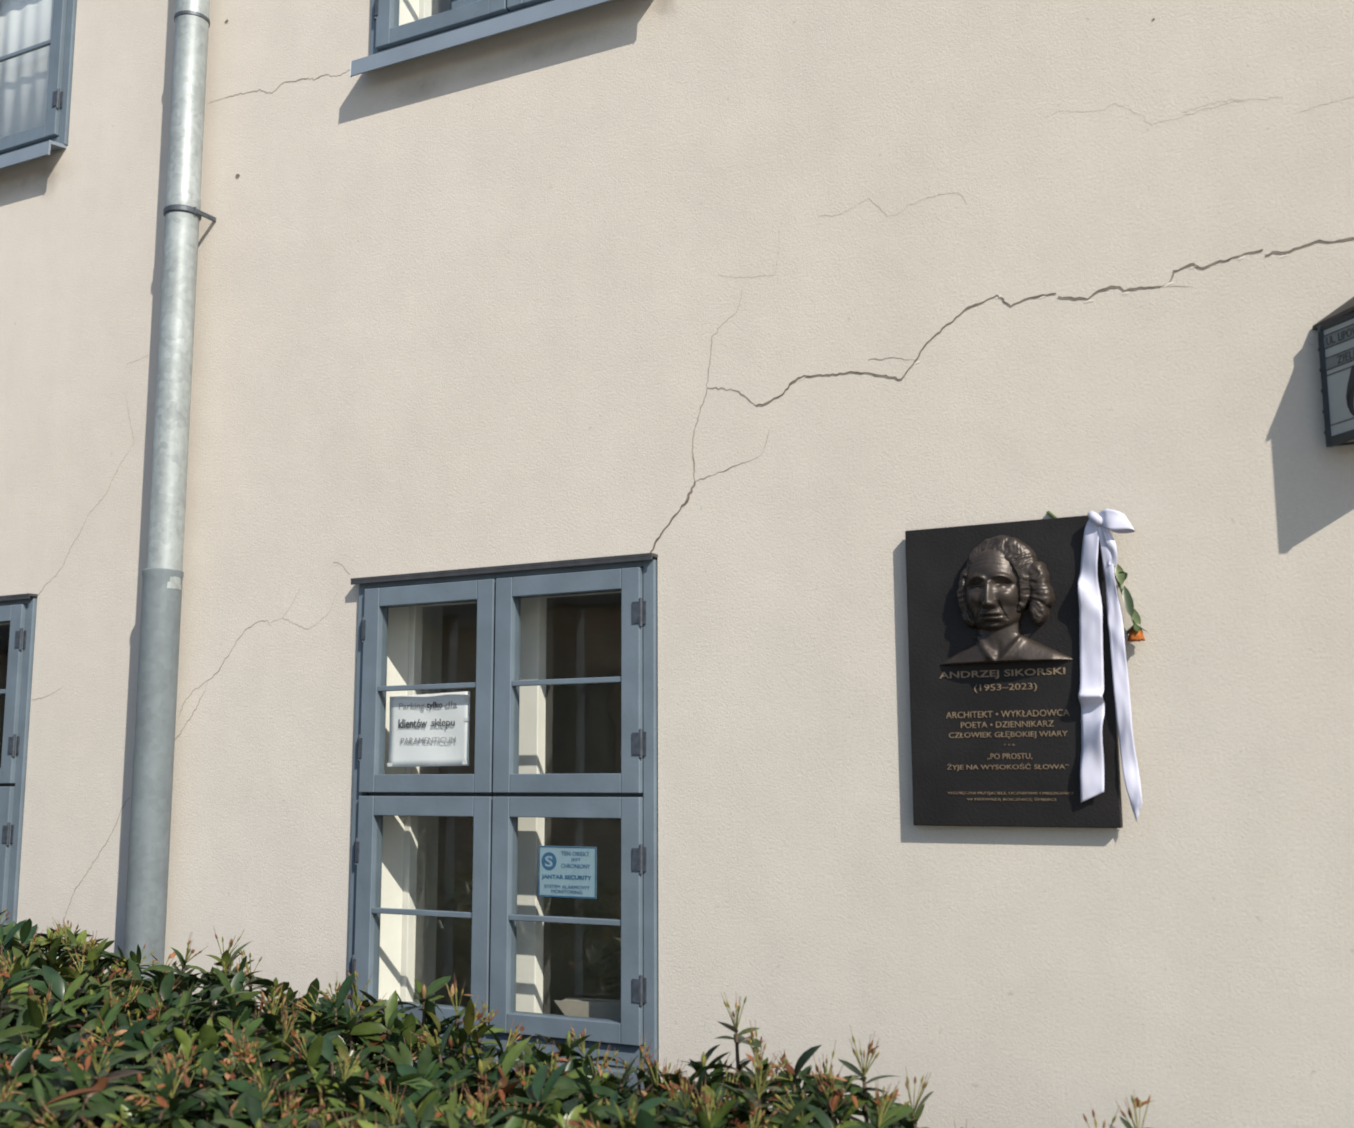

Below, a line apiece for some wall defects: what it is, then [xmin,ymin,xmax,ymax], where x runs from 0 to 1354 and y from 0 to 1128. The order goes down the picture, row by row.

crack [650,218,1354,553]